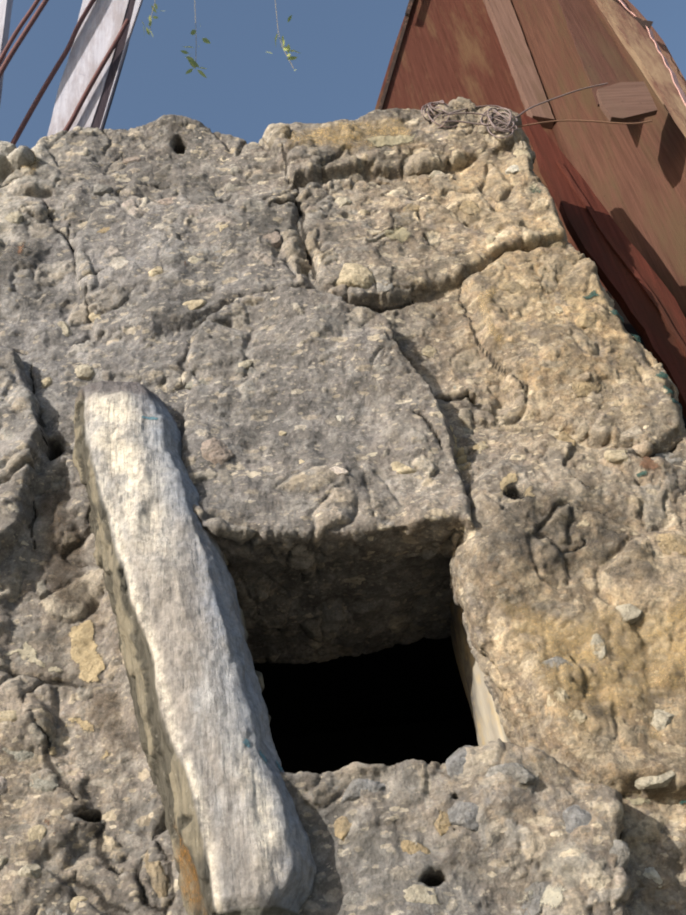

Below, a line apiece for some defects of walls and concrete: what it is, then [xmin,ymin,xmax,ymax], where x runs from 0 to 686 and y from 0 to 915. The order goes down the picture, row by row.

crack [44,202,98,306]
crack [279,146,316,281]
crack [458,292,527,393]
crack [30,366,48,446]
crack [29,502,37,550]
crack [41,728,77,800]
crack [75,823,175,915]